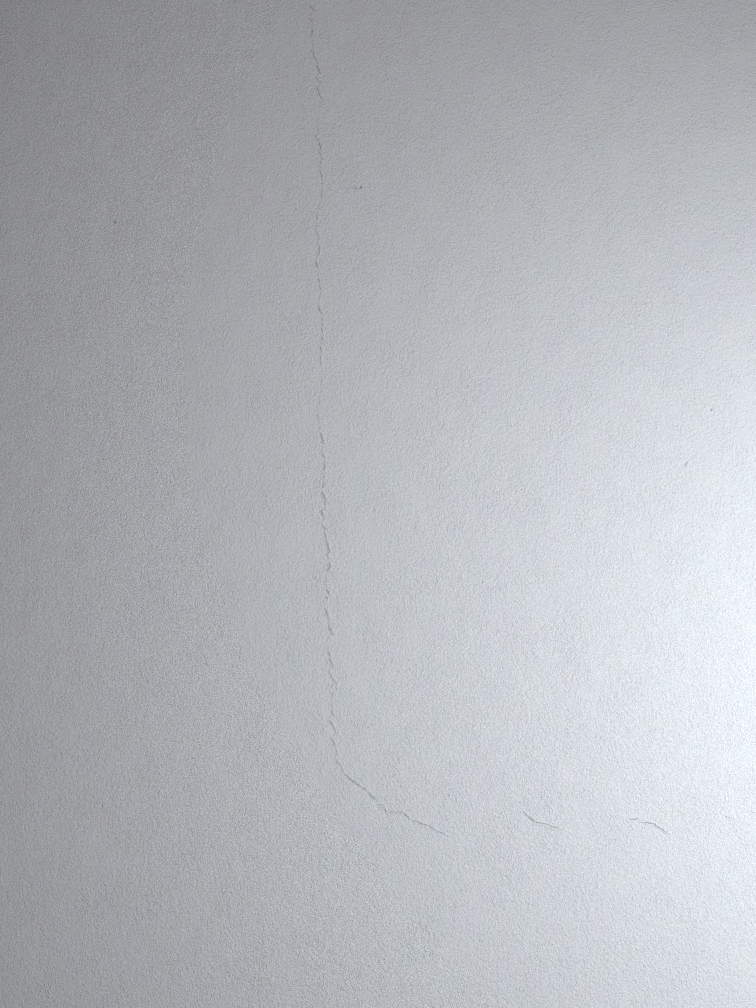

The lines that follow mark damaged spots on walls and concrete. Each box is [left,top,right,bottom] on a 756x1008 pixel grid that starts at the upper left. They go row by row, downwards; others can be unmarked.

crack [309,0,449,837]
crack [491,811,566,833]
crack [629,817,670,834]